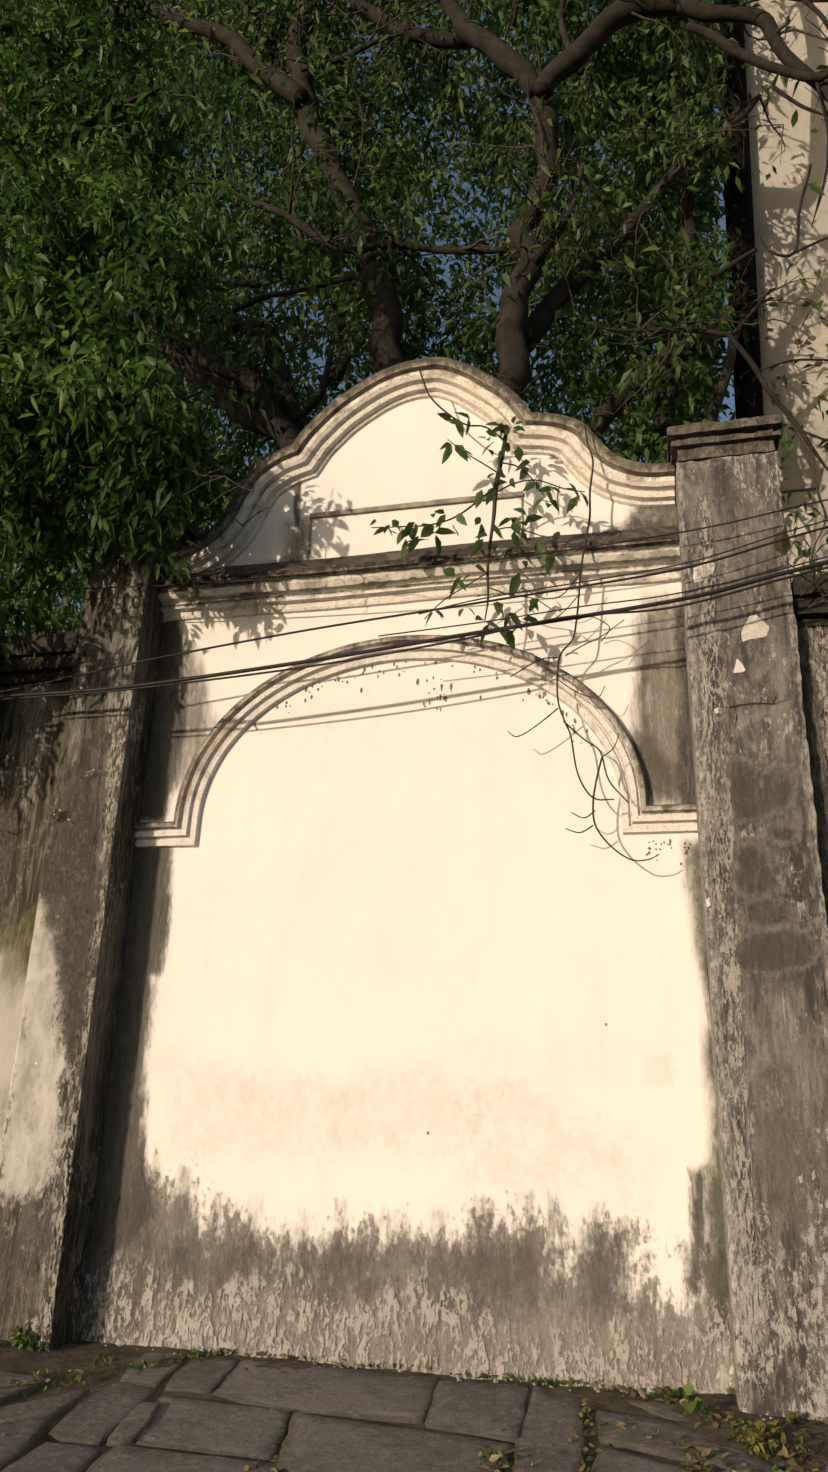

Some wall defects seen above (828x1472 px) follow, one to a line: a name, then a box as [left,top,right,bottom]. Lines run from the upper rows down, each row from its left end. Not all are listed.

damp [613,489,677,559]
damp [0,571,138,1154]
damp [141,621,207,820]
damp [633,601,696,804]
peeling [693,494,769,1359]
damp [721,627,828,980]
damp [78,839,735,1395]